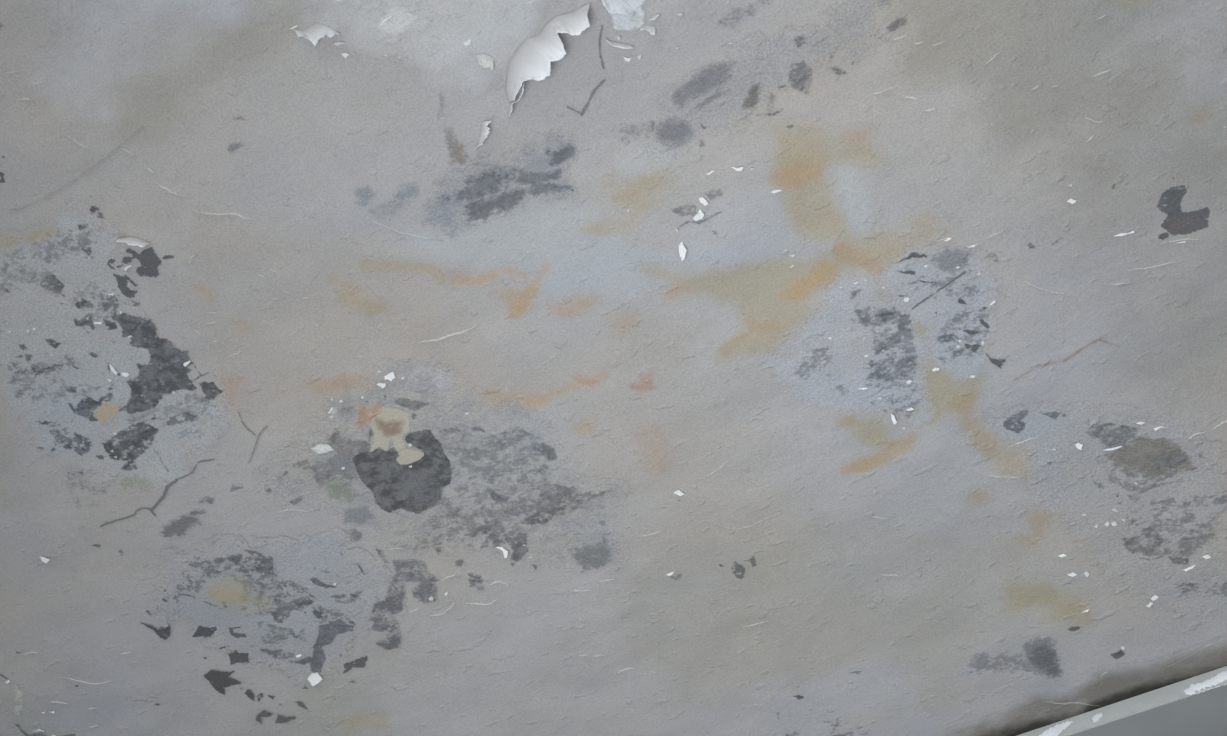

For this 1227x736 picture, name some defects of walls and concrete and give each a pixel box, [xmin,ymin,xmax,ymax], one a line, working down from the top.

peeling [290,23,355,58]
peeling [464,0,660,116]
peeling [475,121,492,151]
rust [577,184,663,241]
peeling [1156,177,1210,243]
rust [773,240,883,304]
peeling [0,198,233,510]
peeling [759,237,1006,430]
rust [836,430,922,477]
peeling [141,357,632,724]
peeling [980,400,1227,619]